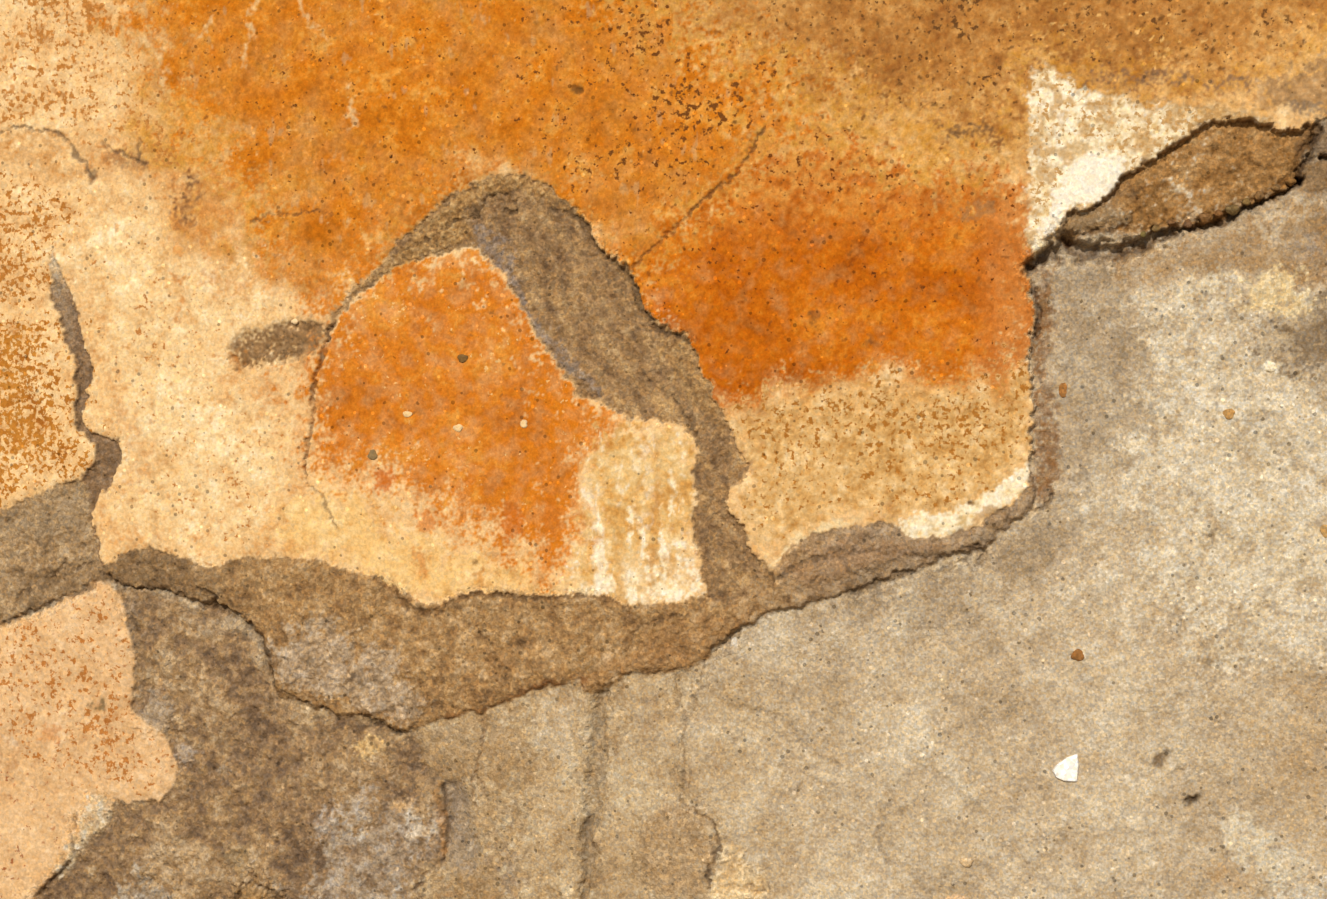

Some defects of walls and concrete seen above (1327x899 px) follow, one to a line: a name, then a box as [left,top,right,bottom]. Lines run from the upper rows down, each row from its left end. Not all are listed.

crack [0,119,154,193]
peeling [0,181,526,617]
rust [0,0,1064,595]
crack [393,117,773,350]
spalling [336,173,874,602]
crack [663,385,707,443]
peeling [894,460,1032,540]
crack [1013,117,1327,348]
peeling [1020,57,1324,245]
spalling [44,591,433,899]
crack [565,677,629,899]